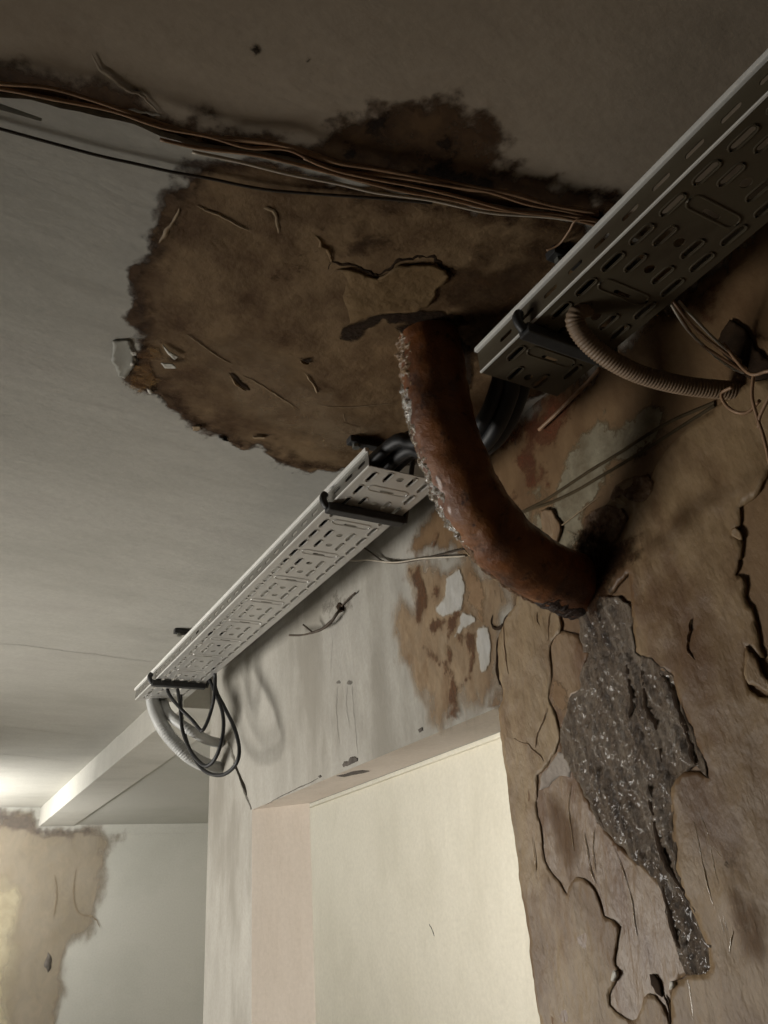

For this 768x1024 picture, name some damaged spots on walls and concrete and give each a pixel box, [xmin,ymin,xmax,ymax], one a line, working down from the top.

peeling [111,339,137,379]
peeling [161,345,179,369]
leakage [0,62,619,606]
crack [314,235,457,276]
peeling [331,264,450,325]
leakage [618,222,768,385]
leakage [490,366,721,551]
leakage [561,616,580,635]
peeling [436,320,768,1024]
leakage [737,477,768,698]